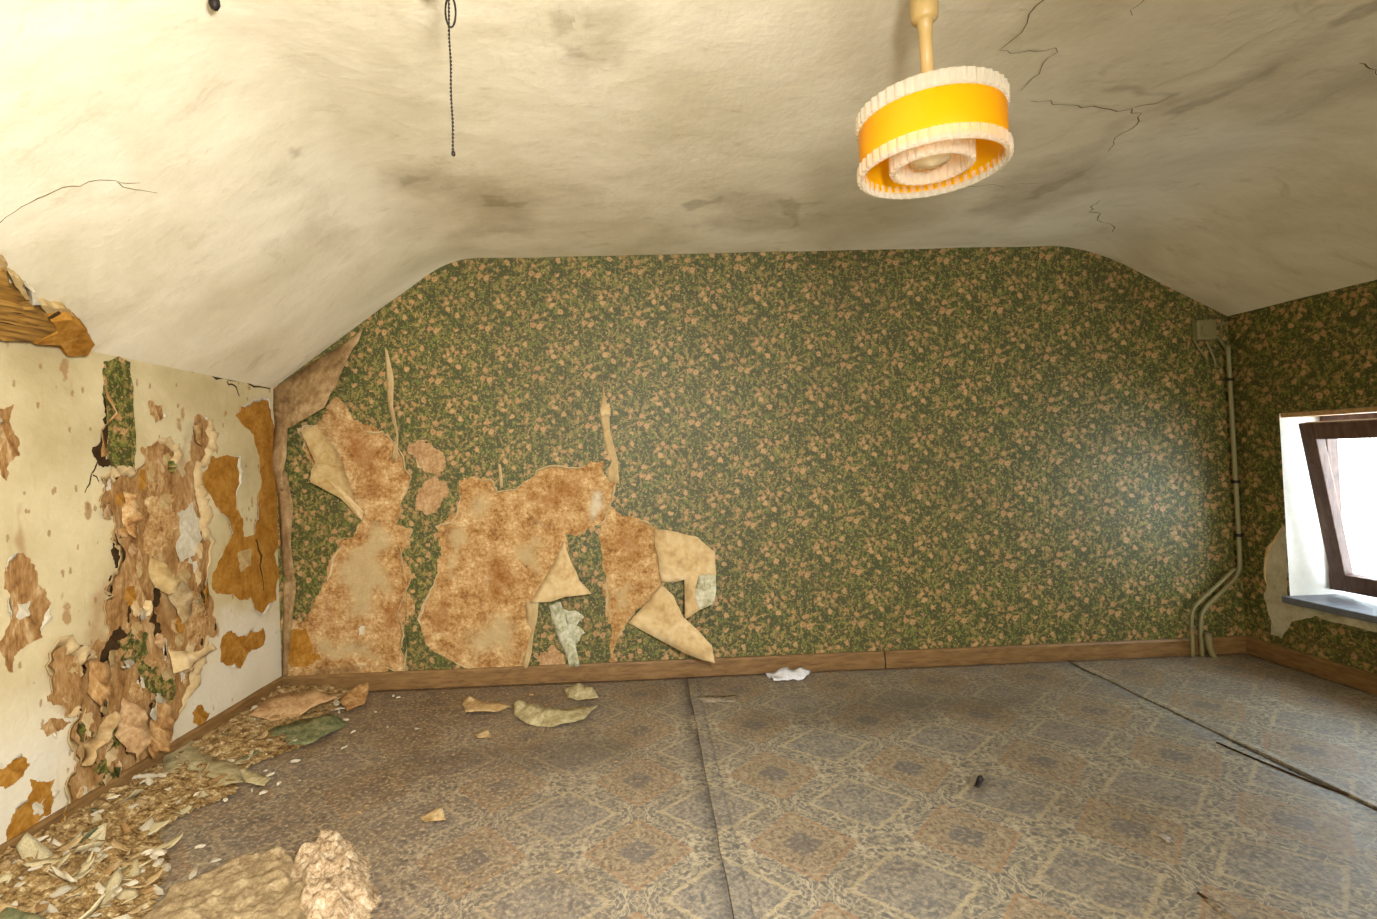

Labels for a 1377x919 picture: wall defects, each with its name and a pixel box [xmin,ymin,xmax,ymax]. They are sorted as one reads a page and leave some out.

crack [999,0,1177,152]
crack [1359,62,1377,76]
crack [0,179,158,223]
crack [0,311,61,328]
flaking render [0,254,95,357]
peeling [0,404,20,481]
peeling [0,552,53,673]
peeling [102,396,279,721]
flaking render [309,511,404,672]
flaking render [437,477,502,588]
peeling [0,753,68,841]
peeling [40,695,128,799]